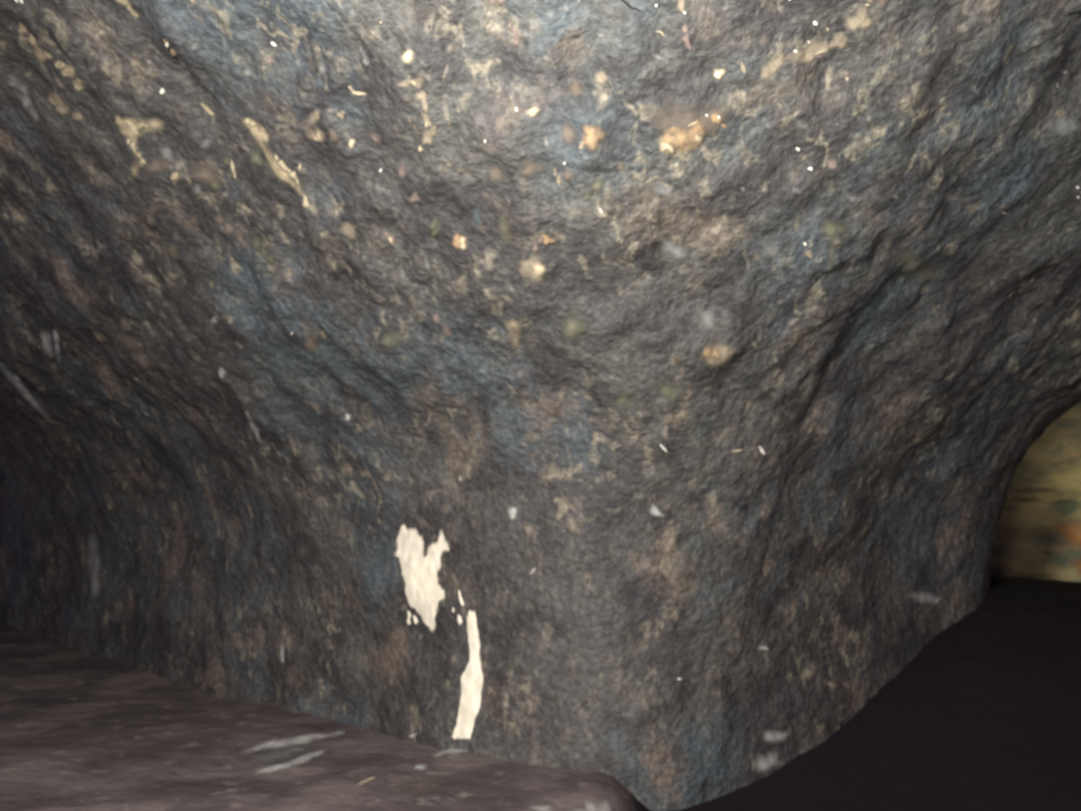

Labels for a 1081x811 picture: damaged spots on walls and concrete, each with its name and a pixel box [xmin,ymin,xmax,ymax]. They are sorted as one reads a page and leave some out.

peeling [396,525,483,739]